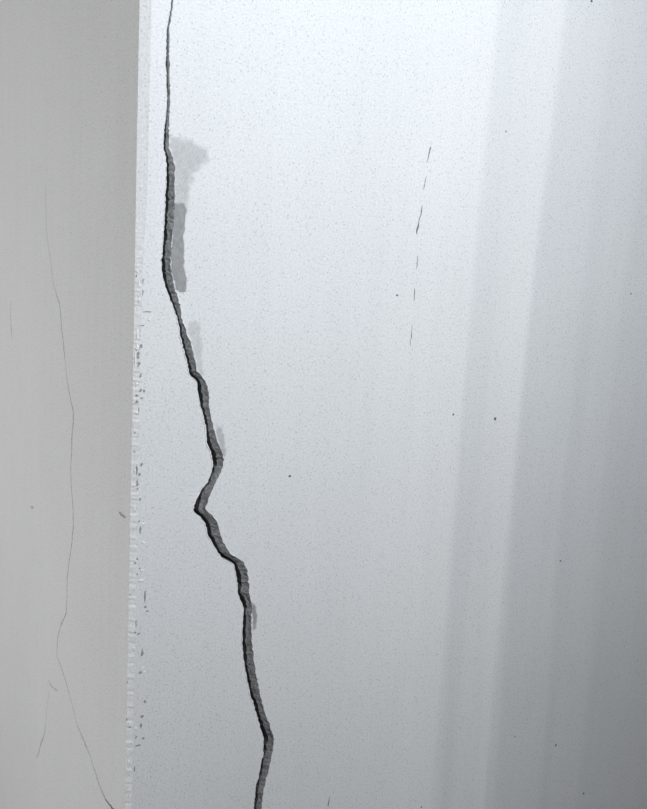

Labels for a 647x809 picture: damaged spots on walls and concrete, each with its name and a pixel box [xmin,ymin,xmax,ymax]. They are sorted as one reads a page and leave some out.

crack [46,228,74,578]
crack [160,0,274,809]
crack [37,601,114,809]